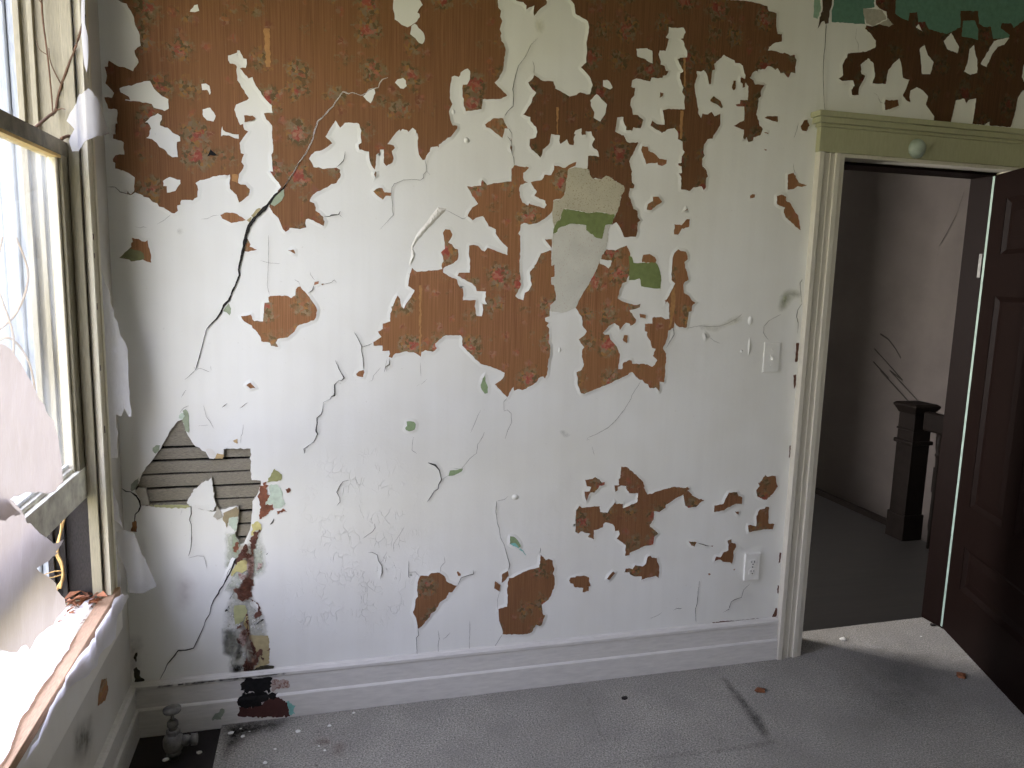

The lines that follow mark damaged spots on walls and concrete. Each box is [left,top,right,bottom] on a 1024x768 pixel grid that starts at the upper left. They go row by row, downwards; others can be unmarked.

peeling [836,0,1024,128]
crack [181,77,388,434]
peeling [101,0,799,400]
peeling [774,170,809,233]
spalling [133,653,144,682]
spalling [127,409,261,551]
crack [156,505,236,679]
damp [159,469,291,687]
crack [269,331,513,656]
peeling [410,568,464,631]
peeling [494,464,780,637]